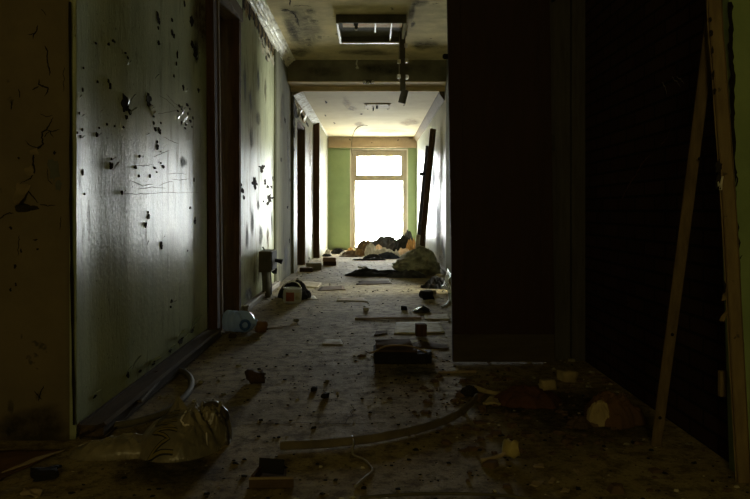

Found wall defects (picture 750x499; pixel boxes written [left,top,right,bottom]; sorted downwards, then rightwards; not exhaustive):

spalling [96,94,137,137]
spalling [146,93,167,152]
crack [11,2,75,425]
spalling [251,165,274,205]